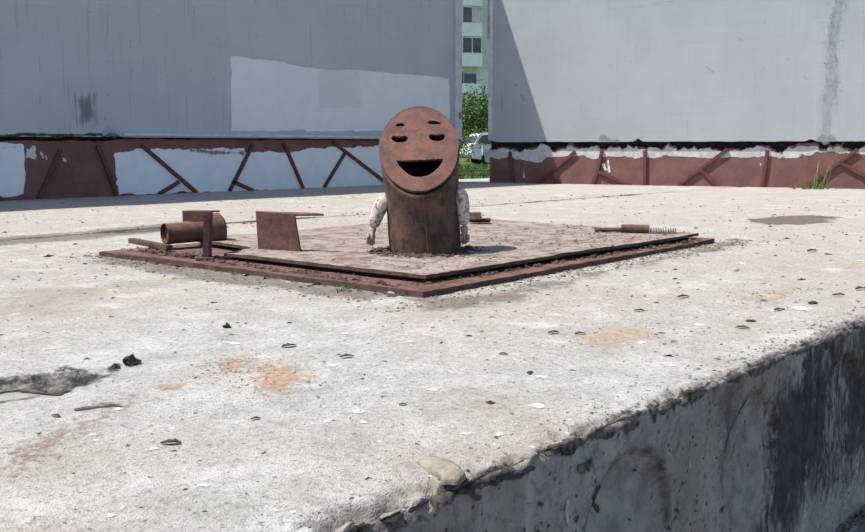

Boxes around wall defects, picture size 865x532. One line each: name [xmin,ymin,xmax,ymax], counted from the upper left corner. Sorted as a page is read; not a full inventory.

peeling [483,144,865,173]
damp [748,215,842,225]
spalling [0,363,121,395]
spalling [538,321,865,458]
spalling [73,402,122,410]
damp [755,322,865,532]
spalling [577,457,593,474]
spalling [429,462,536,508]
spalling [335,500,425,532]